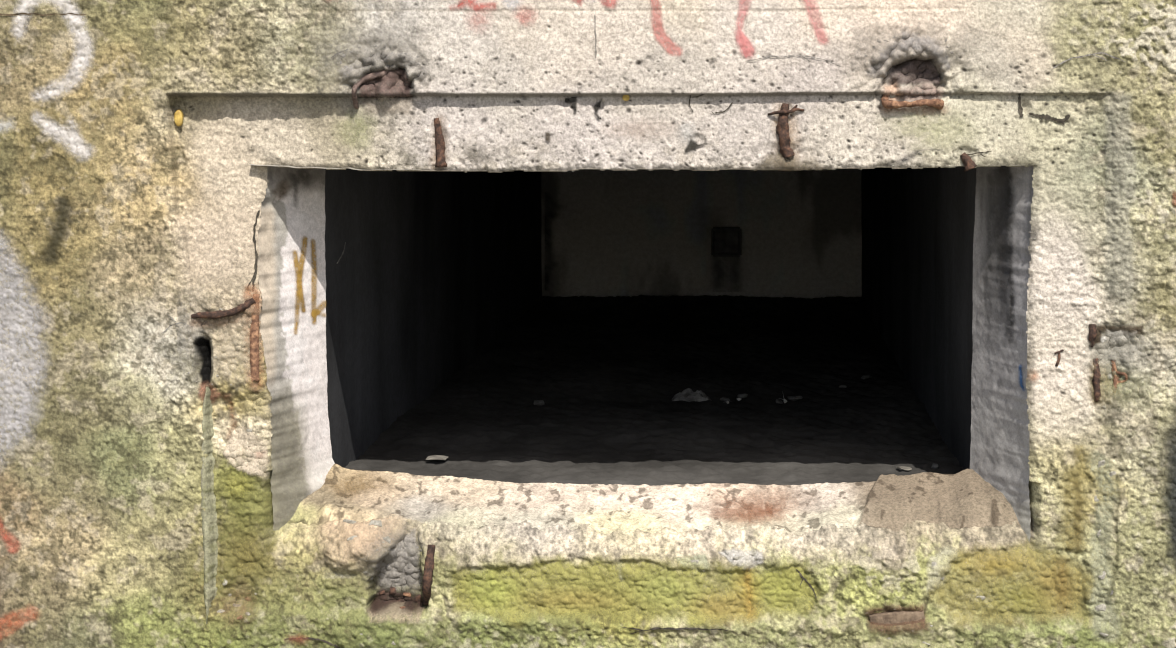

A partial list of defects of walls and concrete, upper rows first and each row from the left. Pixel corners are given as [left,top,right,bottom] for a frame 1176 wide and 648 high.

spalling [339,43,423,109]
spalling [865,31,953,101]
damp [997,176,1013,341]
spalling [186,308,251,402]
corrosion [1088,324,1128,402]
spalling [363,531,435,622]